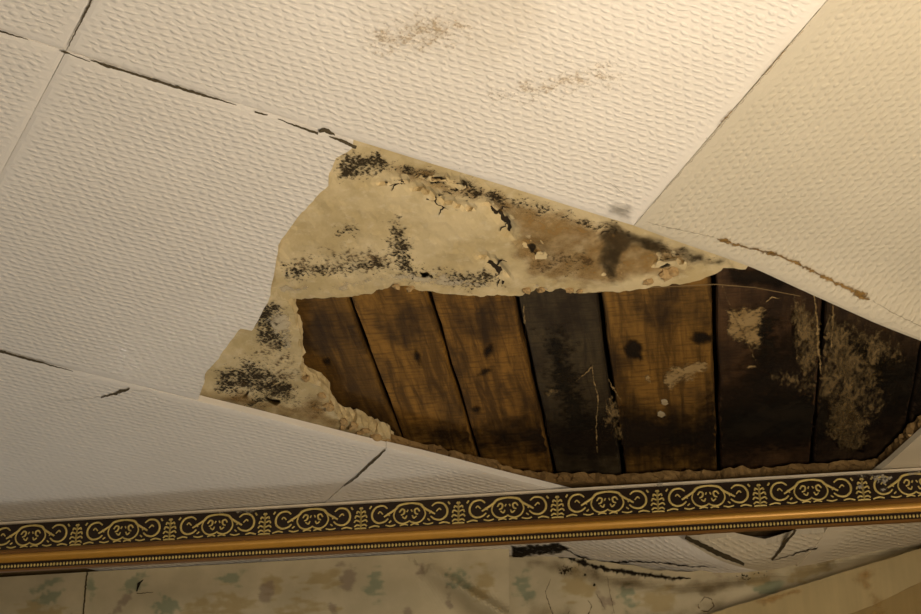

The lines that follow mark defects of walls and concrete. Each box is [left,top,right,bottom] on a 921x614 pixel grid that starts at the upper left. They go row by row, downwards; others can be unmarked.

leakage [281,215,500,292]
crack [491,206,512,231]
leakage [337,151,722,280]
corrosion [718,238,870,300]
flaking render [200,140,921,491]
leakage [433,268,921,464]
leakage [512,543,706,614]